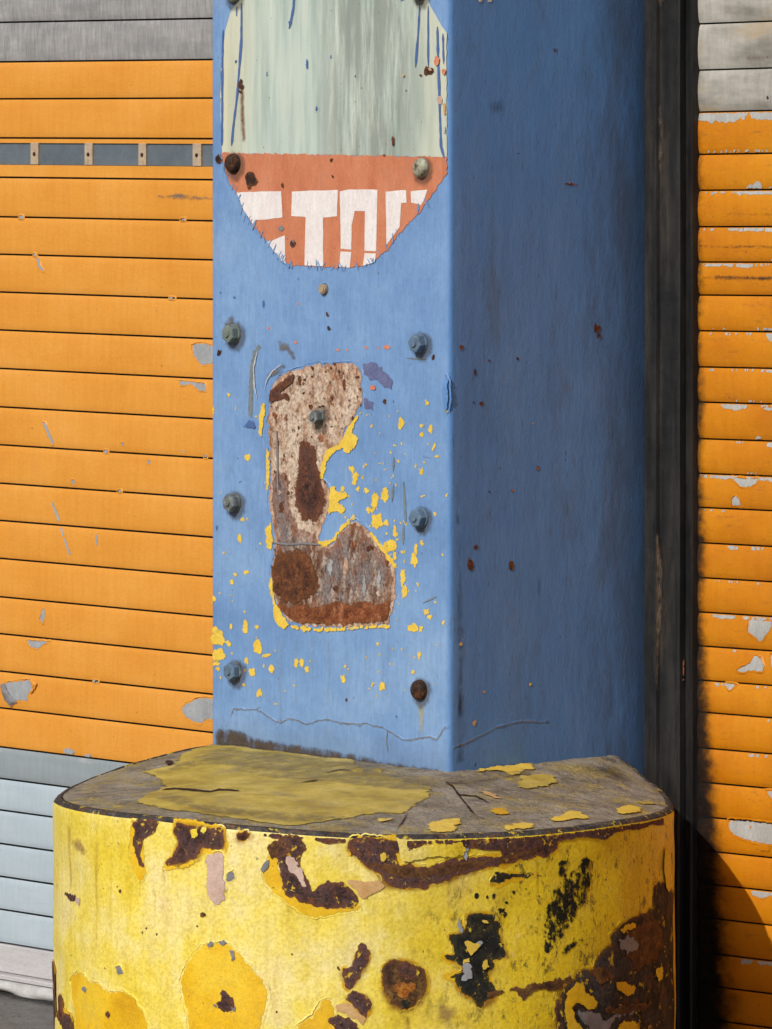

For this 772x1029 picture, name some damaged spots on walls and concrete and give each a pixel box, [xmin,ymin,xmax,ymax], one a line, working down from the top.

corrosion [266,360,399,631]
peeling [269,385,445,633]
peeling [713,614,772,692]
crack [231,706,448,751]
peeling [128,817,159,884]
corrosion [160,818,300,907]
peeling [260,833,363,920]
corrosion [315,818,675,1029]
peeling [543,857,595,954]
peeling [727,817,772,852]
corrosion [52,957,75,1029]
peeling [178,939,278,1029]